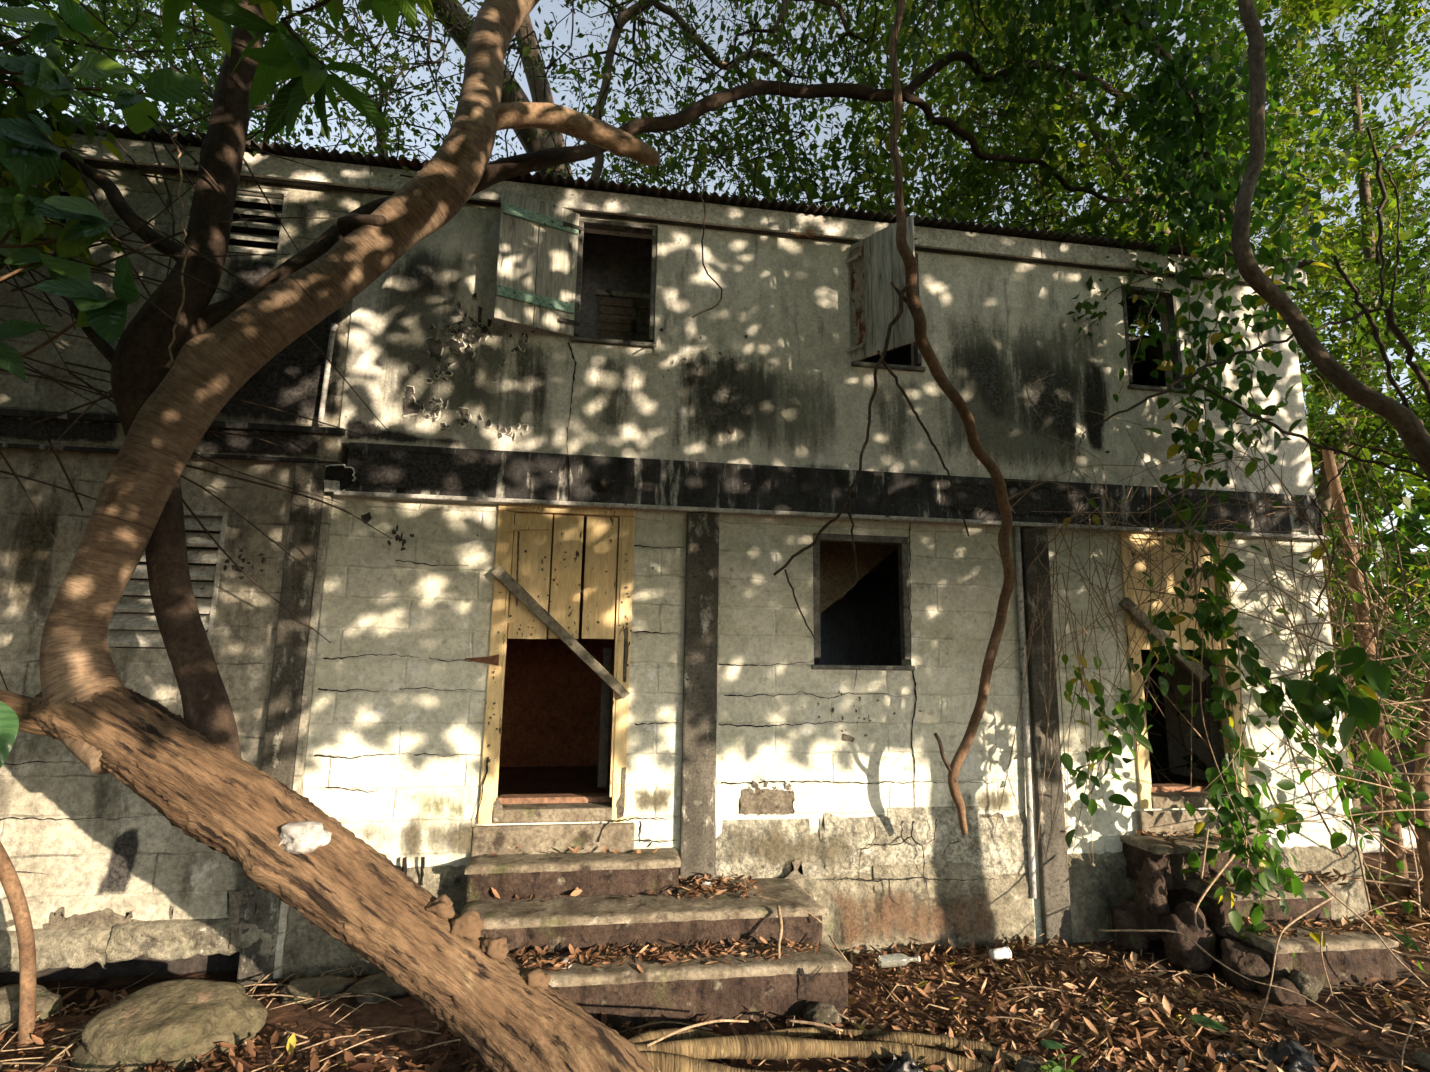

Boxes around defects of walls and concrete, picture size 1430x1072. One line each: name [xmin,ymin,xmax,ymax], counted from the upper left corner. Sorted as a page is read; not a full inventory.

peeling [402,293,537,441]
damp [677,357,835,449]
damp [915,320,1107,518]
crack [719,523,996,904]